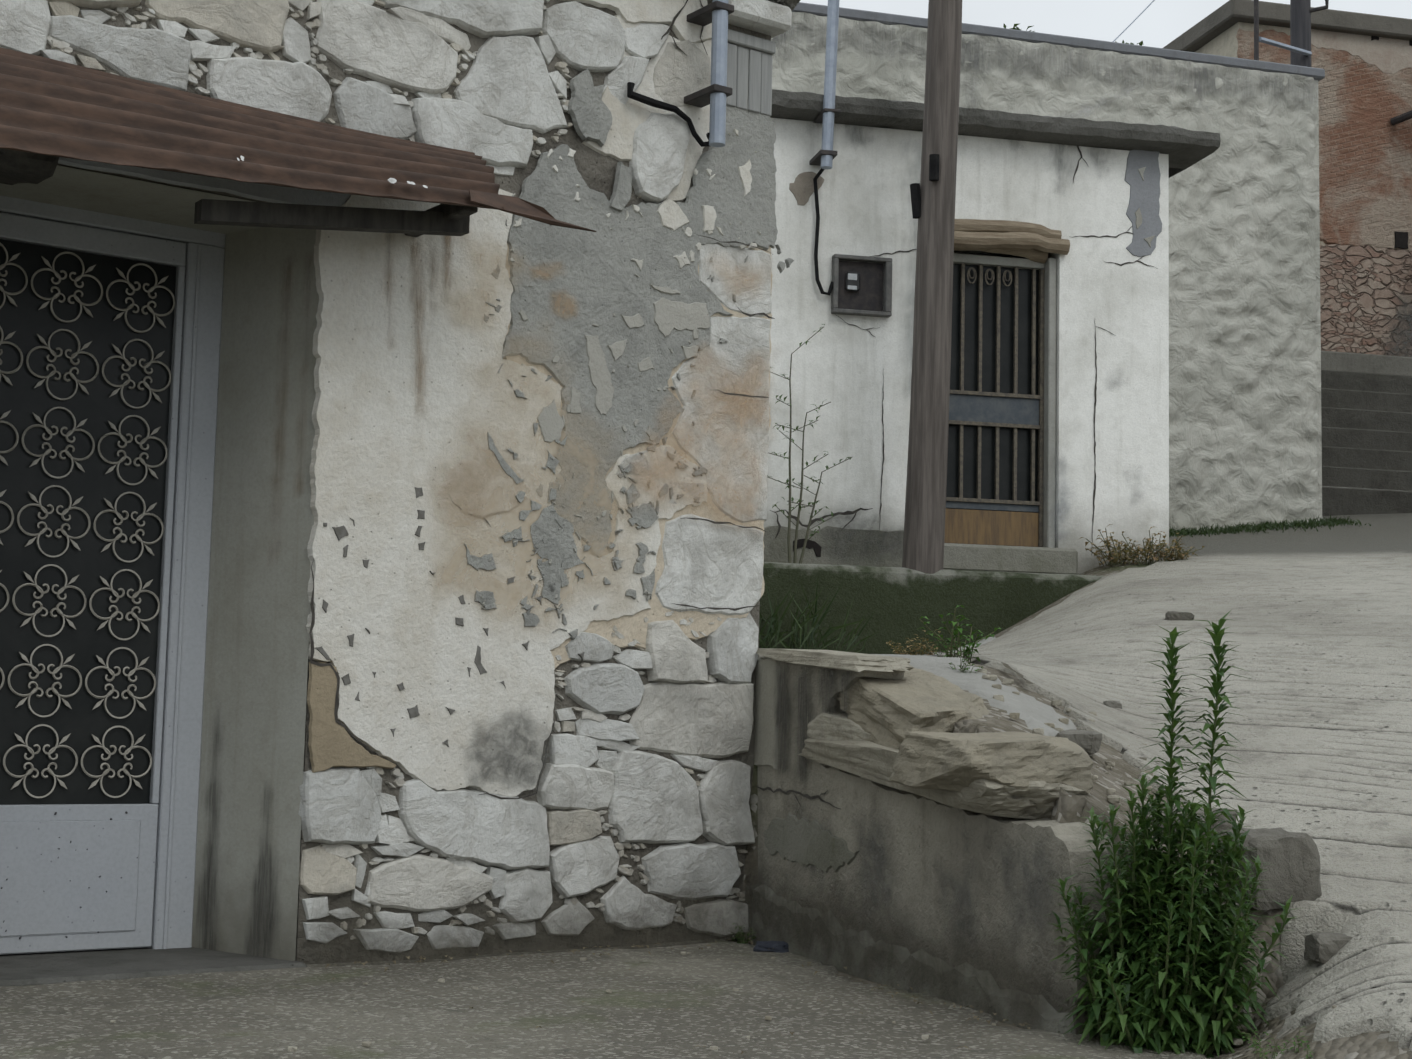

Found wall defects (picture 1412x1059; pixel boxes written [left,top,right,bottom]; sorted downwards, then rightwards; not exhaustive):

peeling [455,69,824,661]
spalling [323,518,370,568]
spalling [415,487,425,550]
spalling [467,628,506,689]
spalling [307,646,396,773]
spalling [407,705,420,719]